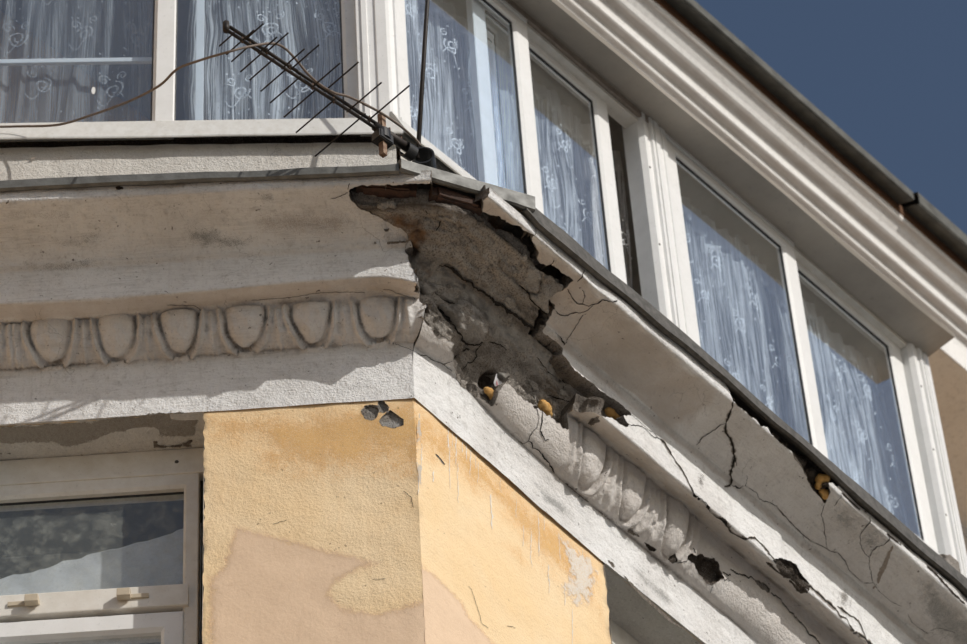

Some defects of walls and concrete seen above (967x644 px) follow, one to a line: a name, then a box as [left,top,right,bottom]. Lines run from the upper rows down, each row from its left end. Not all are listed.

spalling [349,171,631,430]
crack [556,270,617,345]
peeling [0,411,198,455]
crack [519,407,555,473]
crack [630,415,776,560]
crack [698,401,954,644]
flaking render [668,553,724,585]
flaking render [766,558,810,594]